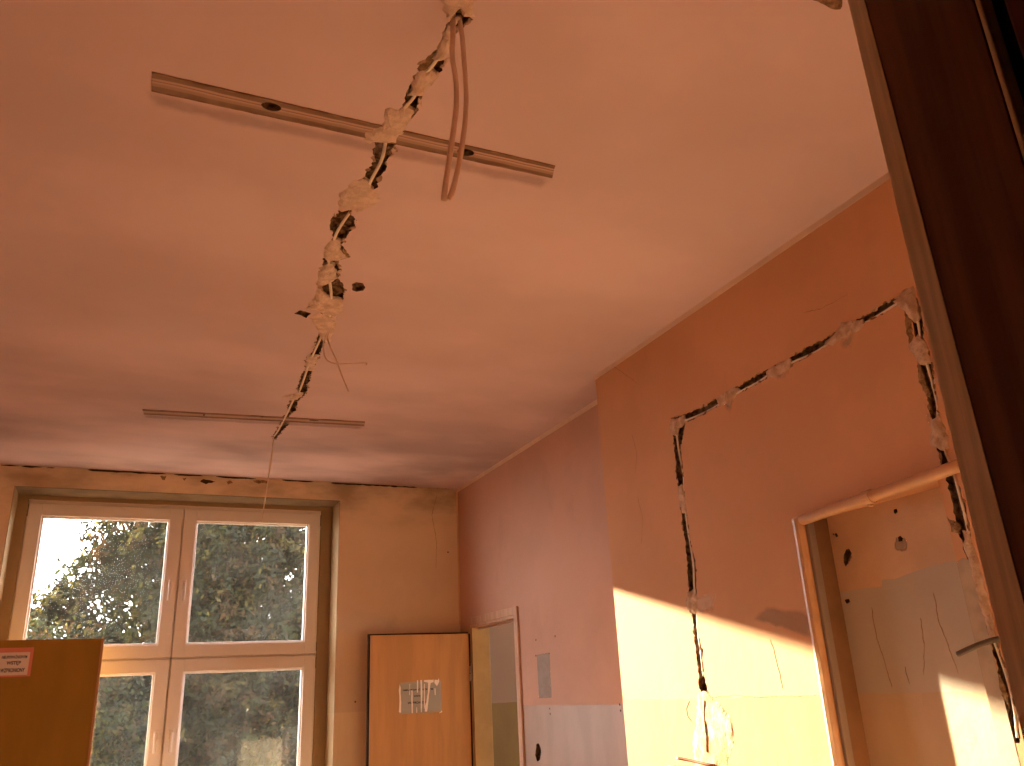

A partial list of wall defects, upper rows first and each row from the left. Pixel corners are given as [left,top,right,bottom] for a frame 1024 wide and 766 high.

spalling [413,53,450,80]
crack [872,593,958,685]